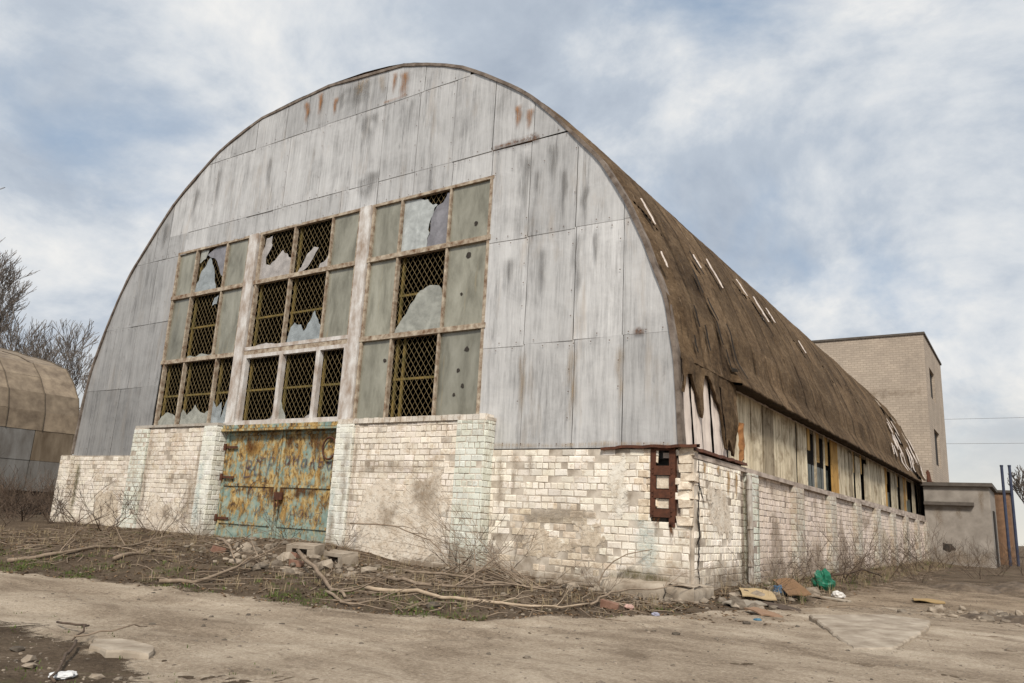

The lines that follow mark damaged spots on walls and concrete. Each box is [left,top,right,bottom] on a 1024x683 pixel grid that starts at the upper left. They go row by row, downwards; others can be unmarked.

corrosion [495,106,539,148]
corrosion [246,438,323,524]
crack [696,460,704,584]